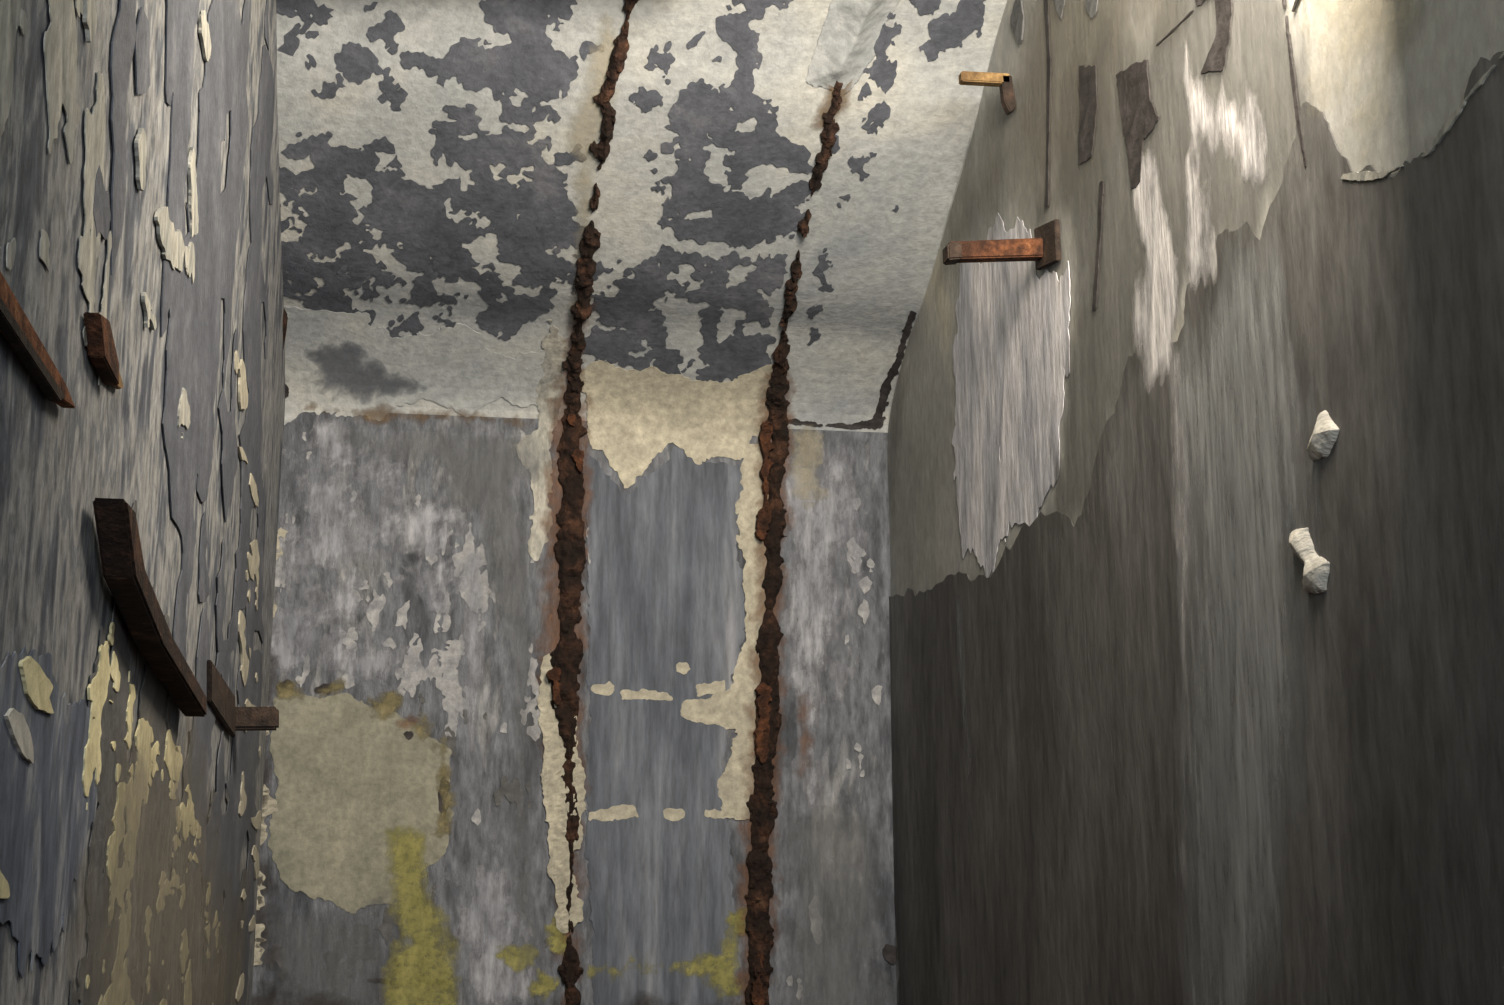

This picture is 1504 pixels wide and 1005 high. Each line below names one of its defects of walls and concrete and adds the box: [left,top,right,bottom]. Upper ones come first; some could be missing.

peeling [910,0,985,62]
spalling [1010,0,1025,45]
spalling [1195,0,1232,74]
peeling [832,12,902,208]
peeling [807,248,834,345]
corrosion [942,219,1061,270]
crack [788,311,917,430]
peeling [0,0,813,1005]
peeling [847,537,875,624]
peeling [871,51,1504,1005]
water stain [93,756,269,1005]
water stain [386,828,567,1005]